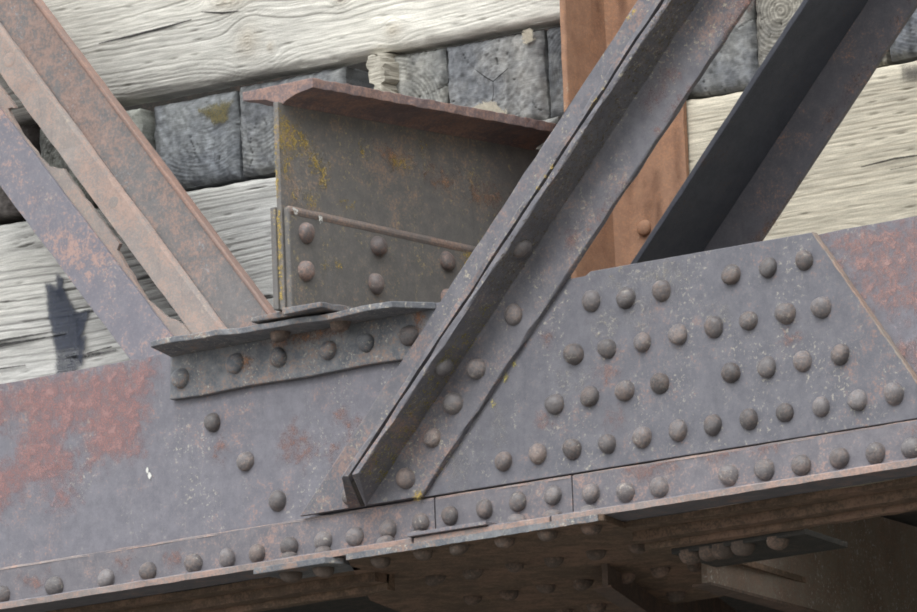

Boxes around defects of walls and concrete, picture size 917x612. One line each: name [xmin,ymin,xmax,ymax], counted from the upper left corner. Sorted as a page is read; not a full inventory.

rust [0,85,192,336]
rust [825,219,917,315]